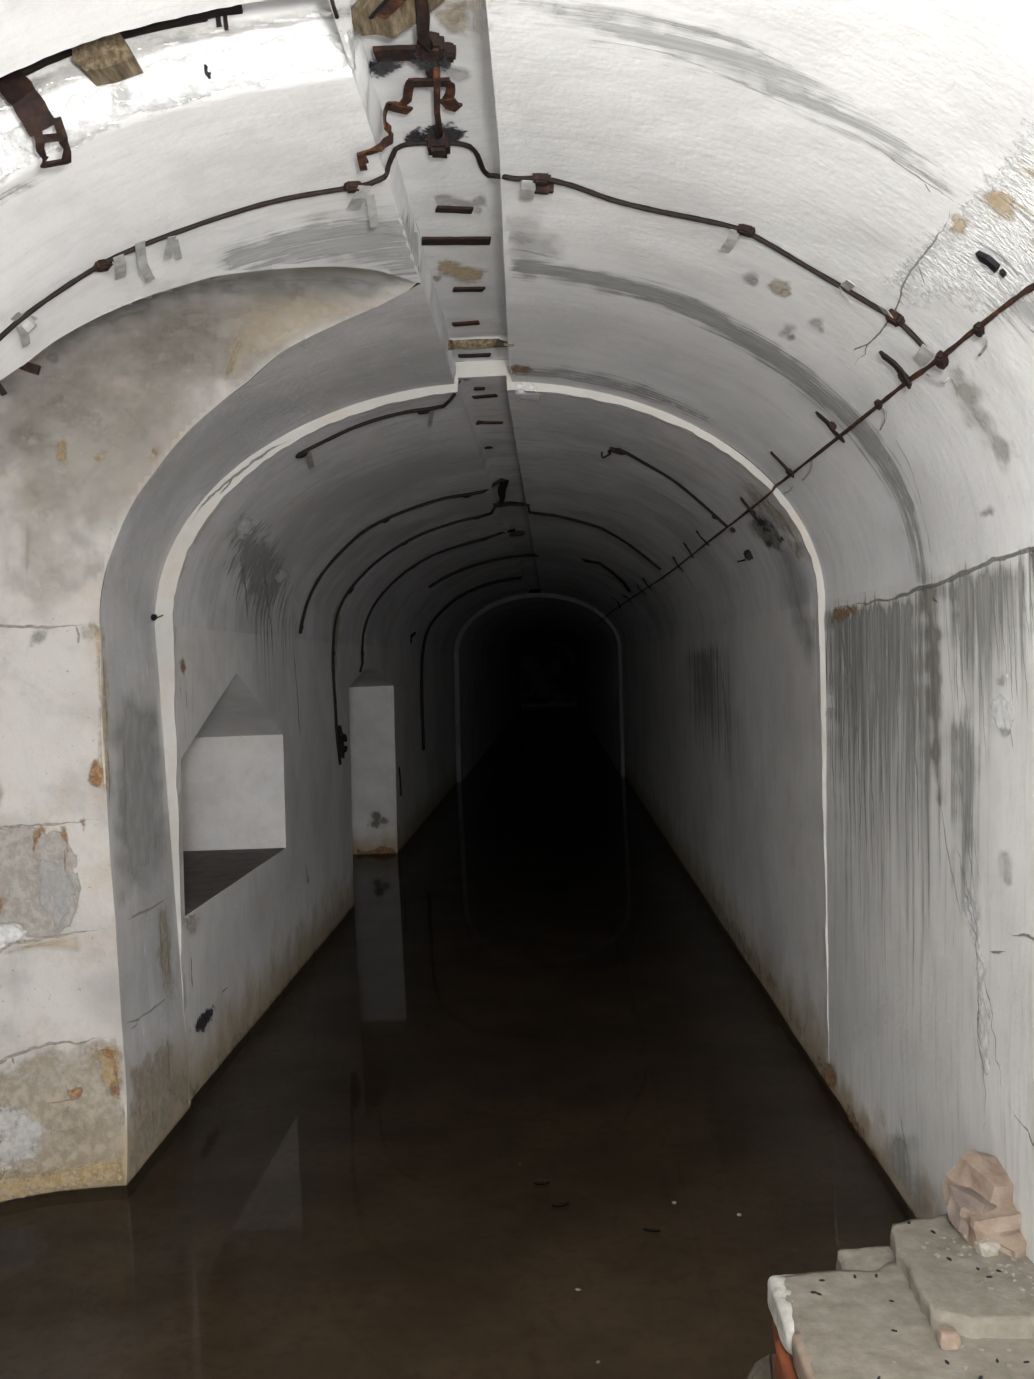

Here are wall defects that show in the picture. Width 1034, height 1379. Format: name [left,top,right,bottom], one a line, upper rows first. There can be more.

leakage [68,299,149,337]
leakage [224,216,481,289]
crack [854,151,955,357]
leakage [227,518,300,729]
leakage [513,237,1034,938]
crack [847,547,1034,617]
spalling [0,827,81,937]
crack [958,853,1034,1146]